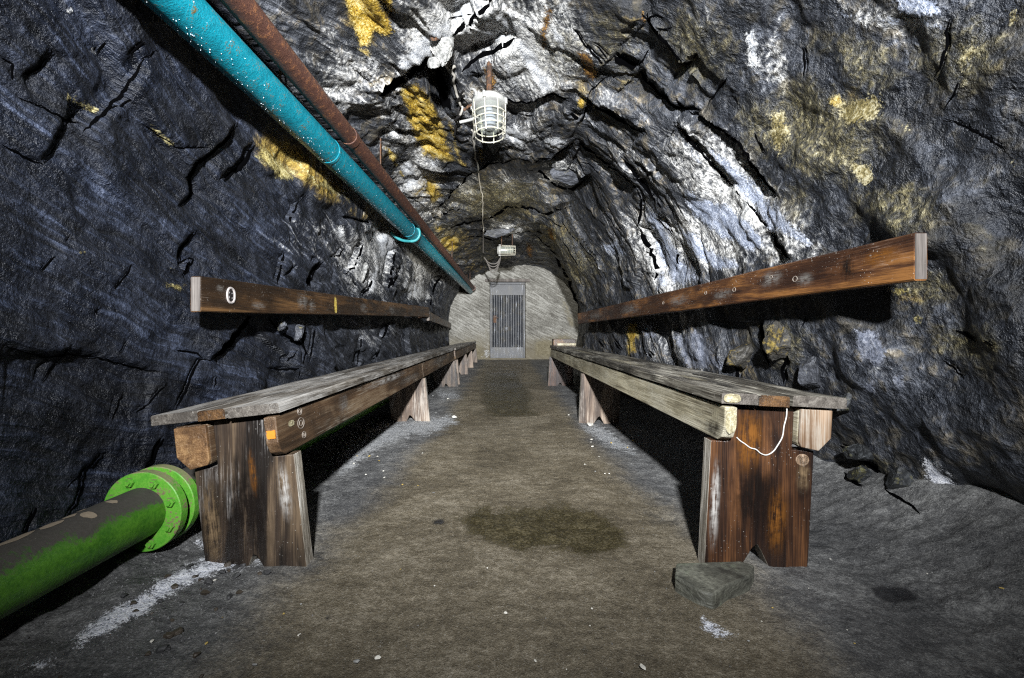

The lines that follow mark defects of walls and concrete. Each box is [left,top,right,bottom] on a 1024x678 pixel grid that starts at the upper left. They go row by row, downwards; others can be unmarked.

damp [457,503,630,555]